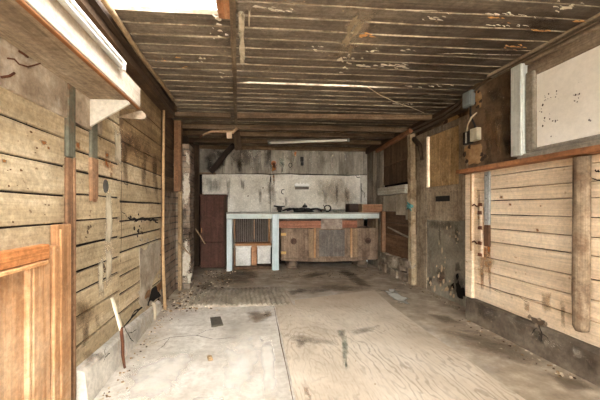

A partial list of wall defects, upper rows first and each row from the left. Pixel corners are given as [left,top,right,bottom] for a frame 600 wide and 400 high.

peeling [337,54,409,73]
crack [121,212,158,237]